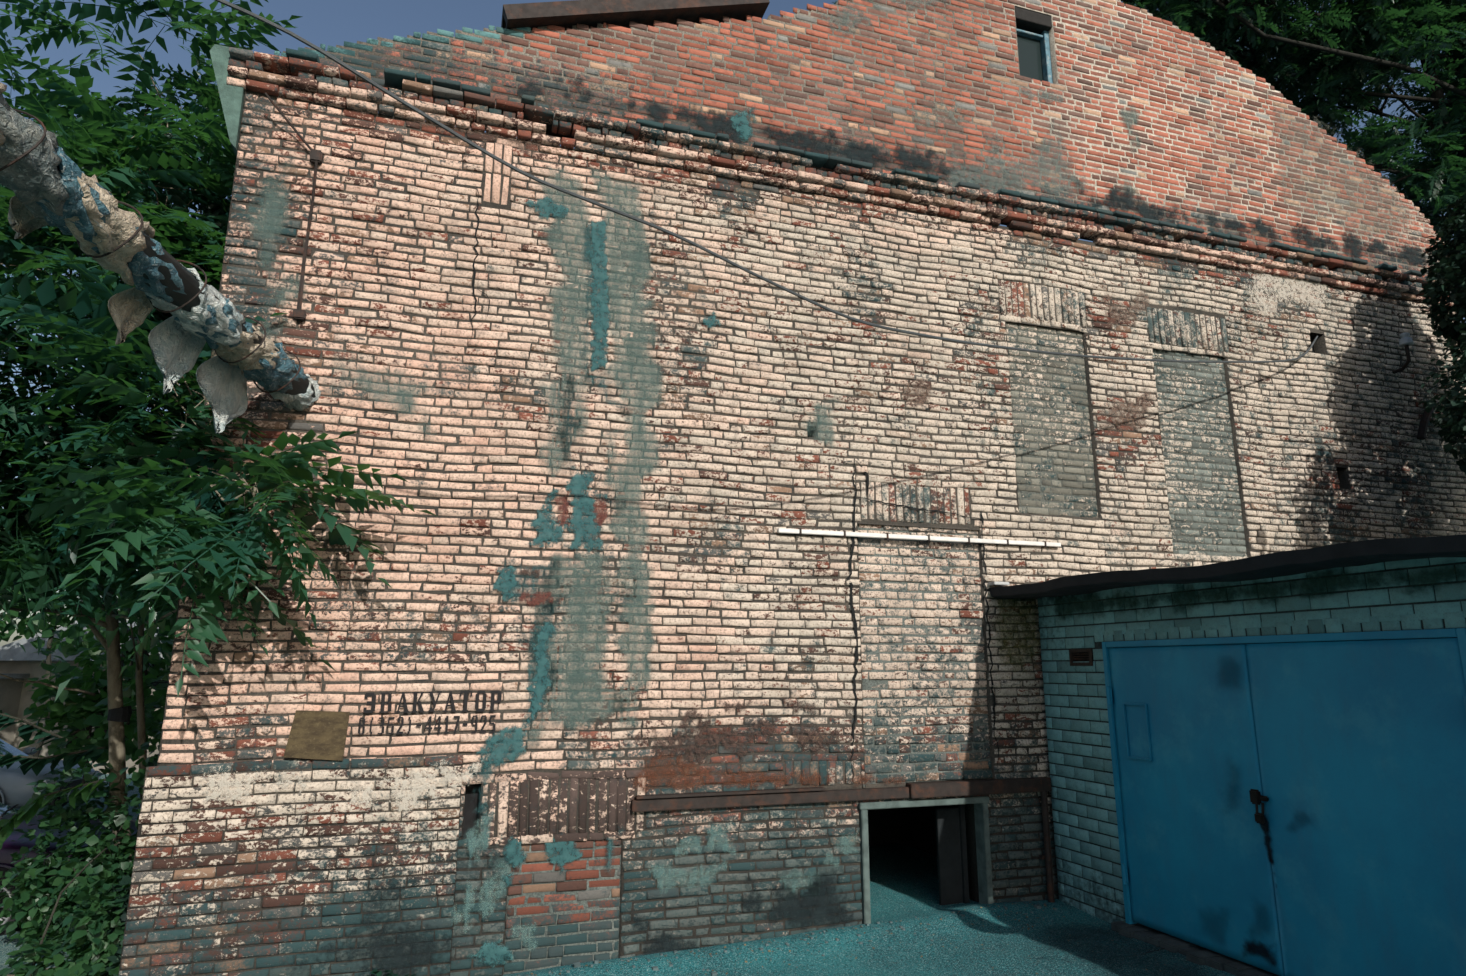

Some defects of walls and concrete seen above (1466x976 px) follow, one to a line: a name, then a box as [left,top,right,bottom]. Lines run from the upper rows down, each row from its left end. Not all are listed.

leakage [518,79,592,100]
leakage [610,99,951,174]
leakage [1077,180,1427,320]
leakage [522,171,662,742]
peeling [1102,392,1151,434]
crack [847,458,999,782]